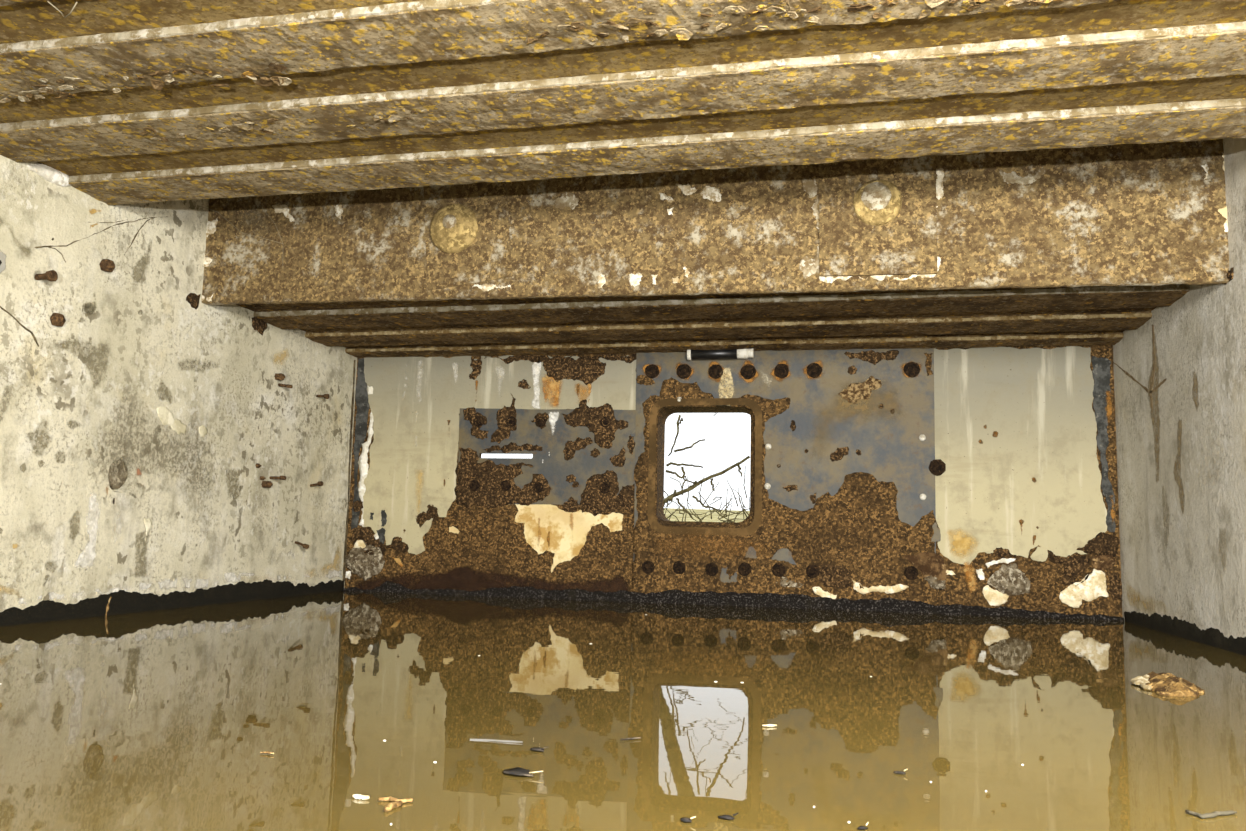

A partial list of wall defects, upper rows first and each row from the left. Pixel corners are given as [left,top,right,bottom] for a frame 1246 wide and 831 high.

corrosion [186,293,201,309]
peeling [345,355,636,581]
corrosion [444,350,941,606]
peeling [924,346,1116,608]
corrosion [351,500,438,567]
peeling [720,567,737,583]
peeling [746,546,797,565]
spalling [776,564,908,599]
corrosion [952,532,975,591]
corrosion [993,519,1120,594]
corrosion [1108,573,1122,601]